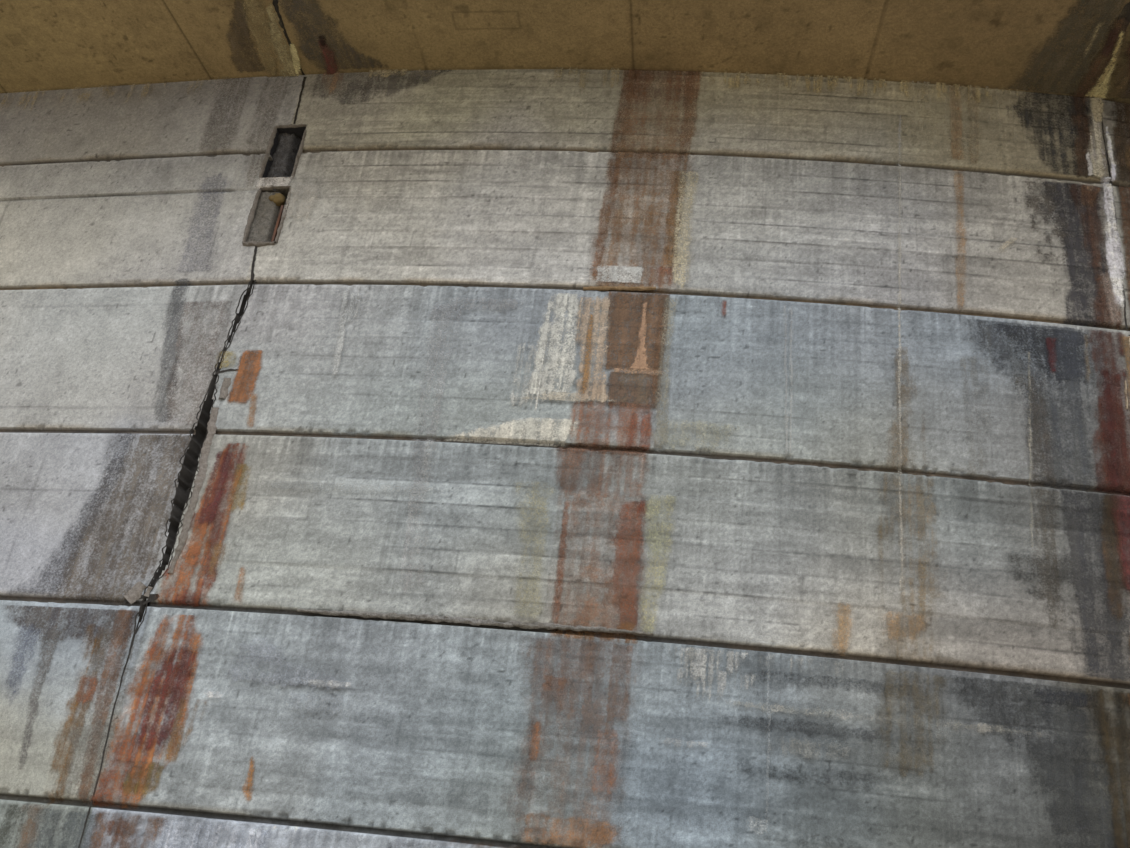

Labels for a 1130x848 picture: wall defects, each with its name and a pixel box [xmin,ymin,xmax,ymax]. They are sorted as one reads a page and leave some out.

leakage [0,173,228,848]
rust [52,443,248,848]
crack [78,246,257,848]
rust [220,350,262,426]
leakage [248,163,317,218]
leakage [205,0,449,152]
rust [519,152,690,848]
leakage [713,0,1130,680]
leakage [951,677,1116,848]
rust [1070,19,1130,494]
crack [1098,100,1130,336]
crack [1117,2,1130,38]